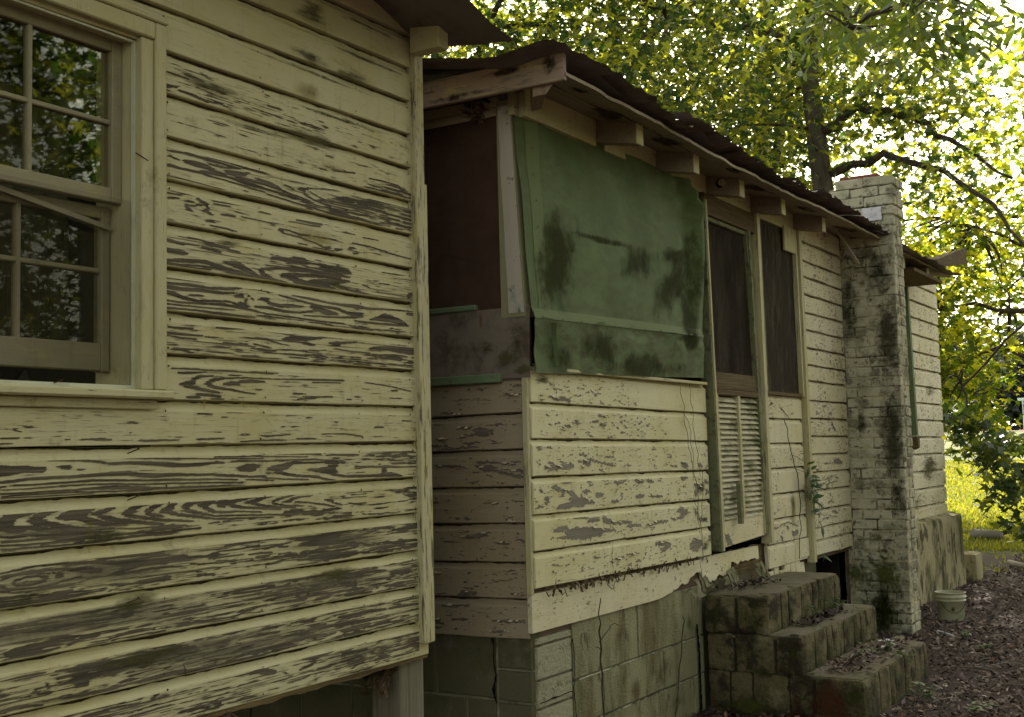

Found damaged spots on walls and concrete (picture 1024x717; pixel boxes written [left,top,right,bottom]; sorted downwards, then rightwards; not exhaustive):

peeling [166,63,379,148]
peeling [167,128,414,368]
peeling [53,431,183,442]
peeling [171,367,345,418]
peeling [197,415,416,443]
peeling [431,374,711,637]
peeling [0,451,419,717]
crack [490,638,498,704]